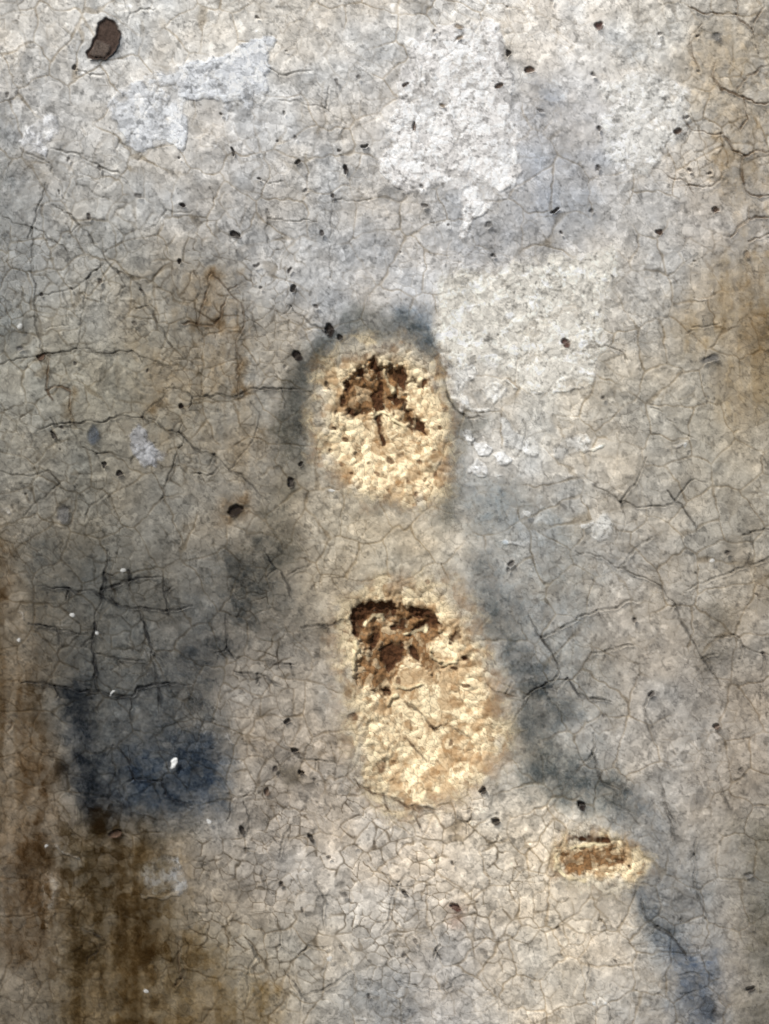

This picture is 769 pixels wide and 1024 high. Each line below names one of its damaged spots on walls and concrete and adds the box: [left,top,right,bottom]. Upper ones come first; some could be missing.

crack [688,69,769,241]
crack [182,273,244,329]
crack [11,348,255,488]
crack [187,387,282,406]
spalling [309,249,618,509]
crack [23,550,188,717]
crack [224,639,293,685]
spalling [337,575,510,819]
crack [507,635,608,701]
crack [356,781,433,825]
spalling [549,827,650,894]
crack [642,905,686,959]